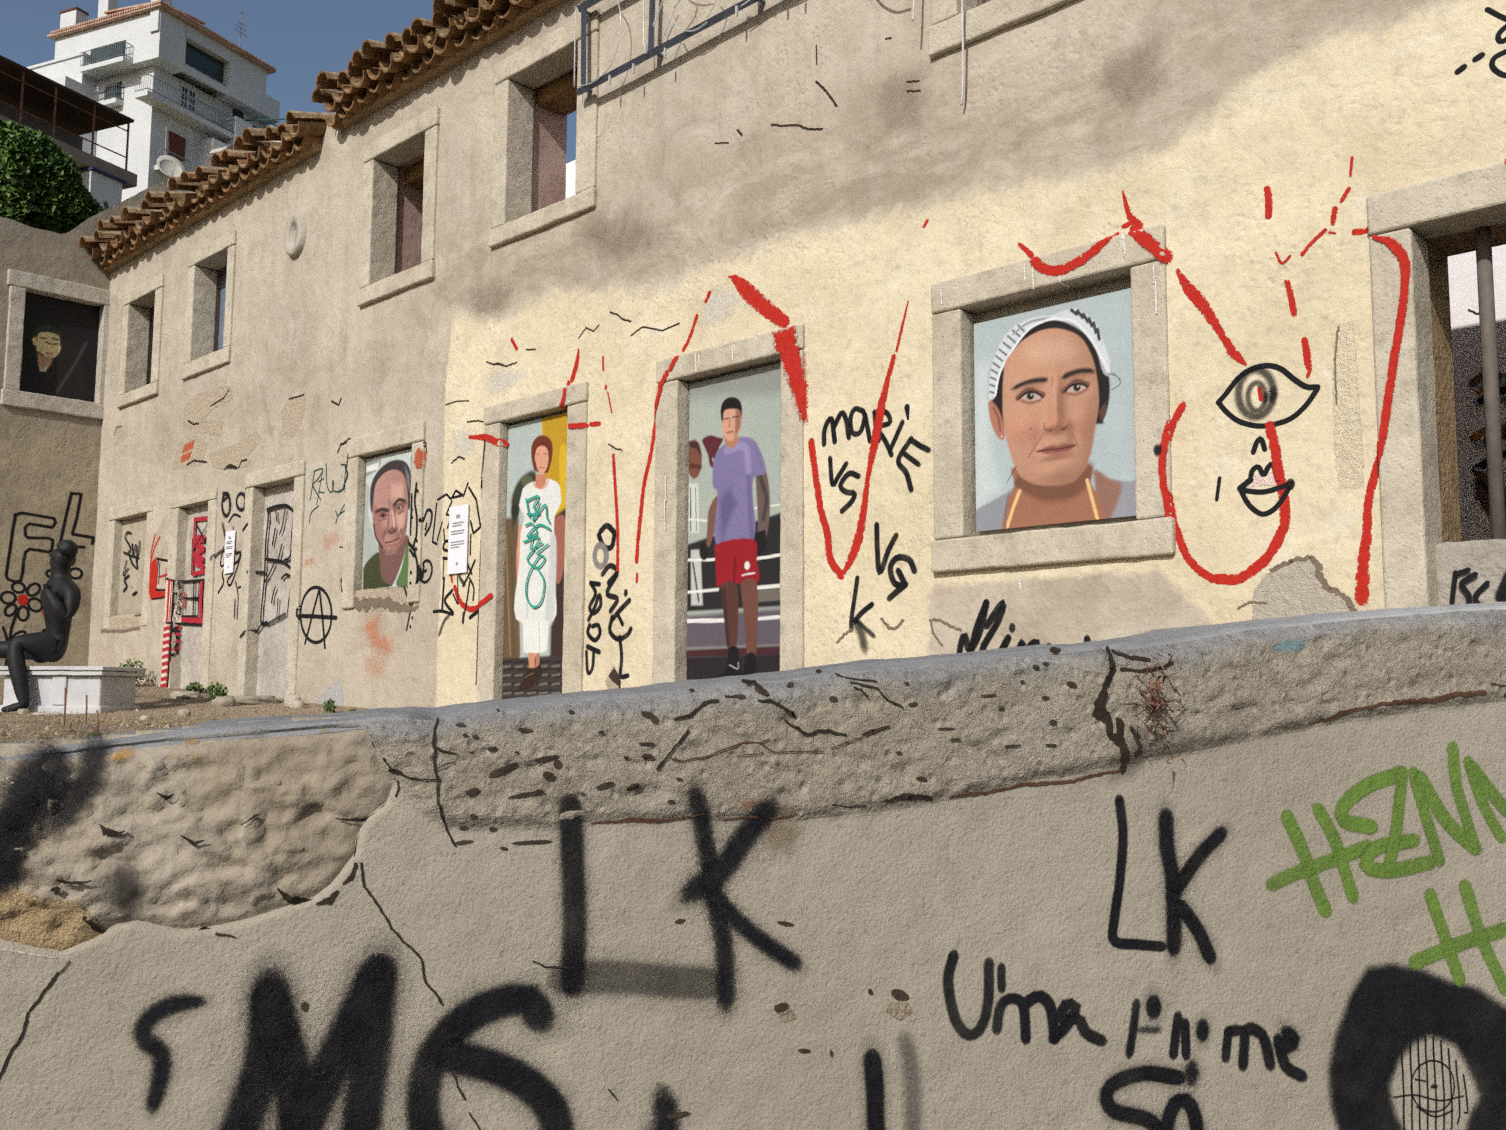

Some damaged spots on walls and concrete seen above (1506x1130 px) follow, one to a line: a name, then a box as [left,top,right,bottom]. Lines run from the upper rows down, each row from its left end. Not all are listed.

spalling [1252,555,1358,620]
flaking render [605,667,621,689]
crack [656,617,962,770]
crack [591,646,1174,824]
crack [1309,682,1506,724]
spalling [0,713,392,958]
crack [335,717,458,1006]
crack [0,961,70,1076]
crack [532,960,567,968]
crack [452,1072,480,1130]